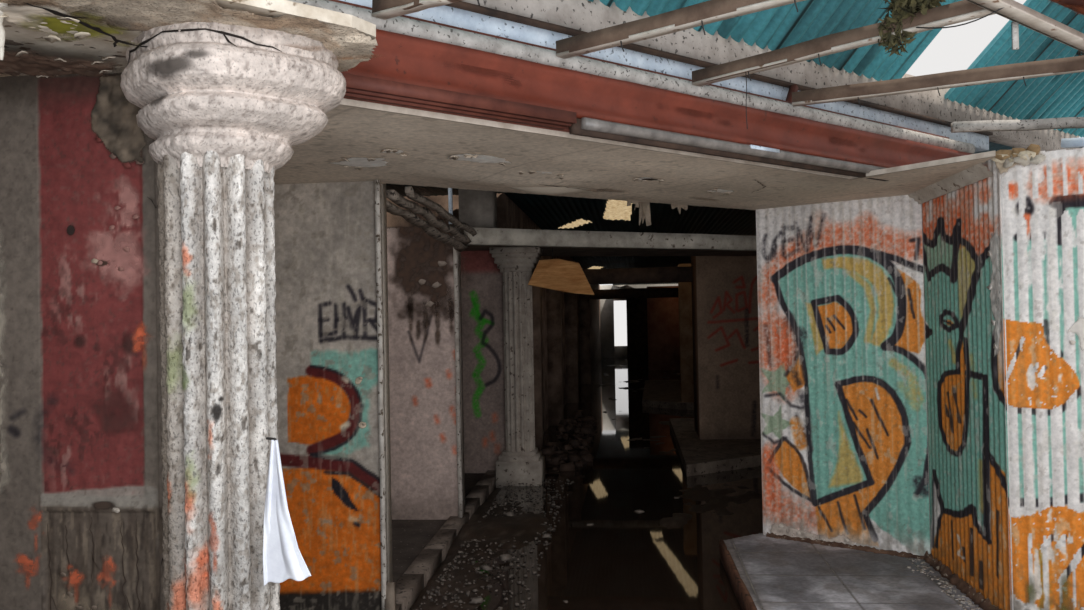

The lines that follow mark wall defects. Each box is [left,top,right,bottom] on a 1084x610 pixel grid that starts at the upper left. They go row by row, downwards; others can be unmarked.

flaking render [0,6,91,43]
crack [26,3,282,63]
leakage [391,195,464,344]